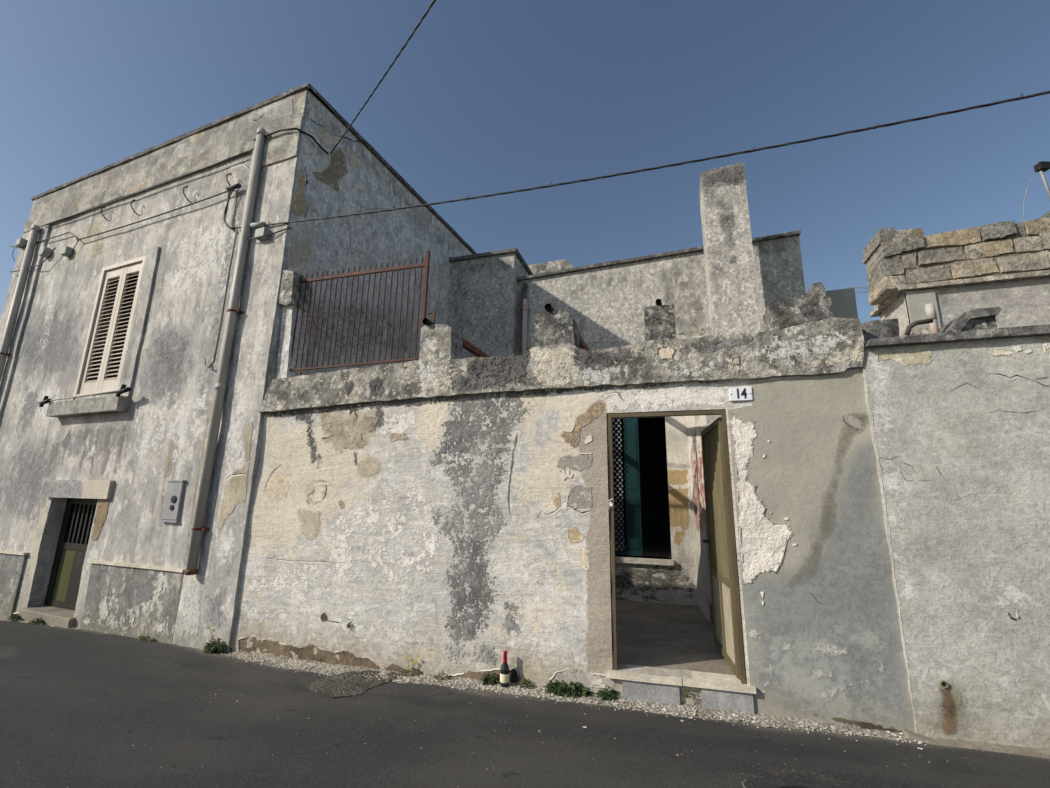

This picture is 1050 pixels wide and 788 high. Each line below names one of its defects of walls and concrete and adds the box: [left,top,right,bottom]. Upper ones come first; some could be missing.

flaking render [291,126,348,216]
flaking render [876,349,936,366]
flaking render [989,340,1050,358]
crack [954,373,1050,413]
damp [263,282,718,665]
flaking render [553,401,605,509]
flaking render [730,413,797,584]
crack [880,456,967,500]
flaking render [238,635,413,673]
corrosion [941,690,956,734]